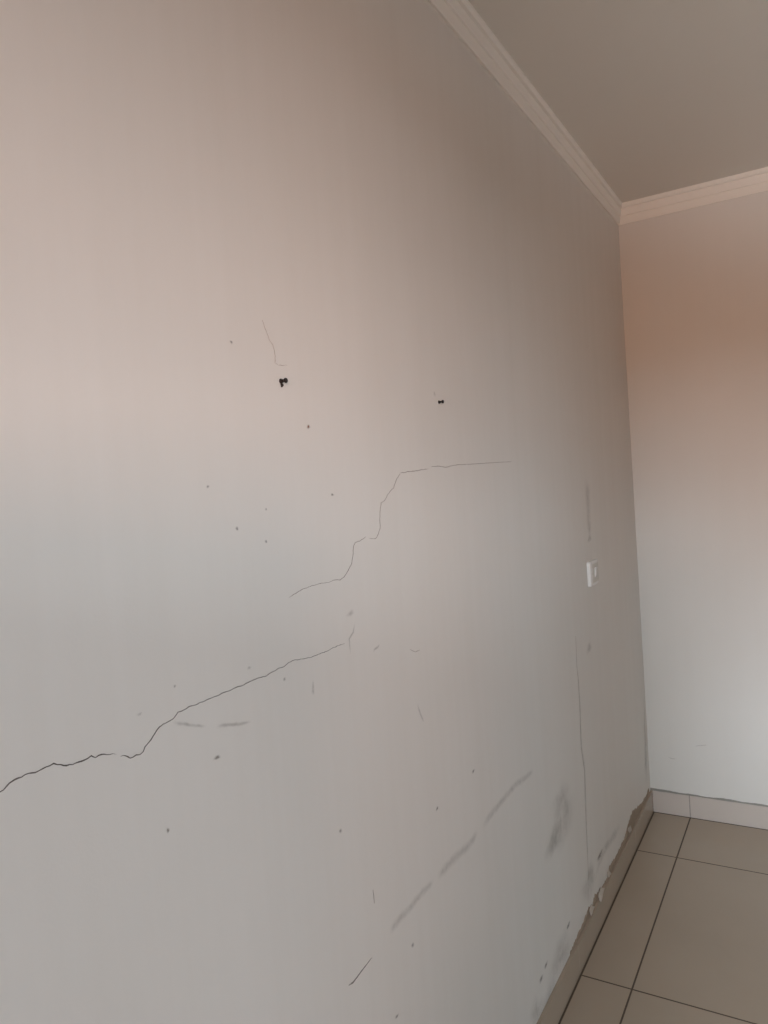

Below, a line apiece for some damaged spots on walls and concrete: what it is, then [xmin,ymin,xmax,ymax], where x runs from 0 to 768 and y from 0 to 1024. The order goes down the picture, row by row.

crack [290,461,512,597]
crack [0,644,342,792]
peeling [570,788,649,954]